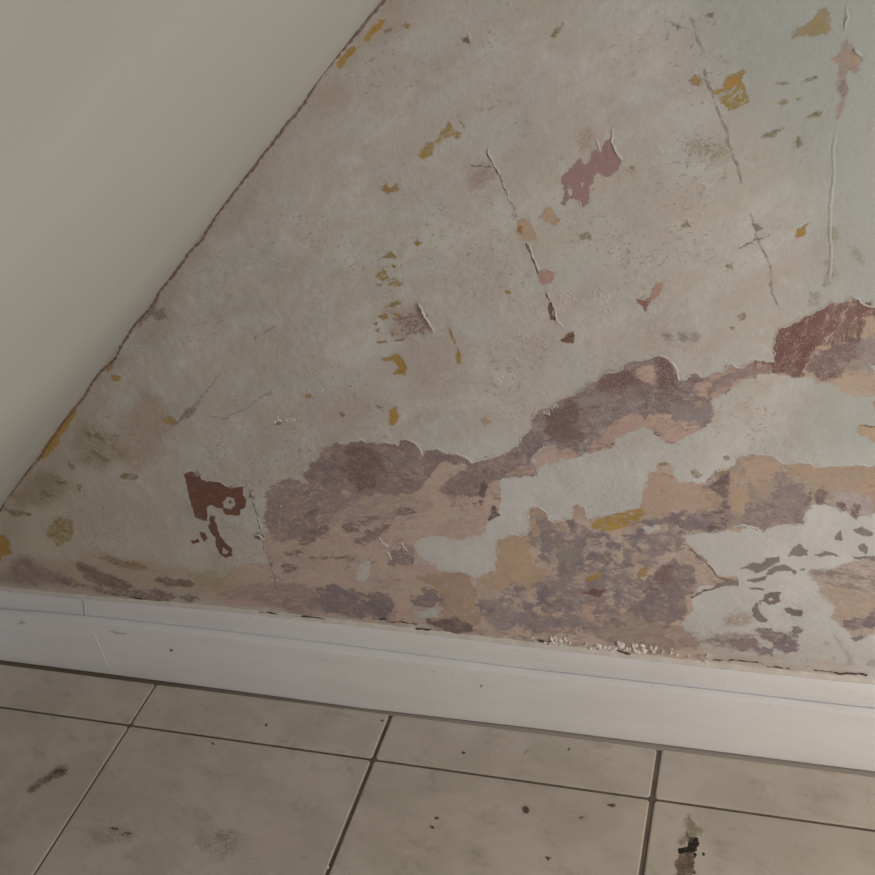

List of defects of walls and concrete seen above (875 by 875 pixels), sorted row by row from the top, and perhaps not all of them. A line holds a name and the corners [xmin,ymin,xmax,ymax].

peeling [832,39,864,122]
peeling [561,123,622,207]
crack [463,149,575,344]
spalling [636,282,664,312]
peeling [183,296,875,661]